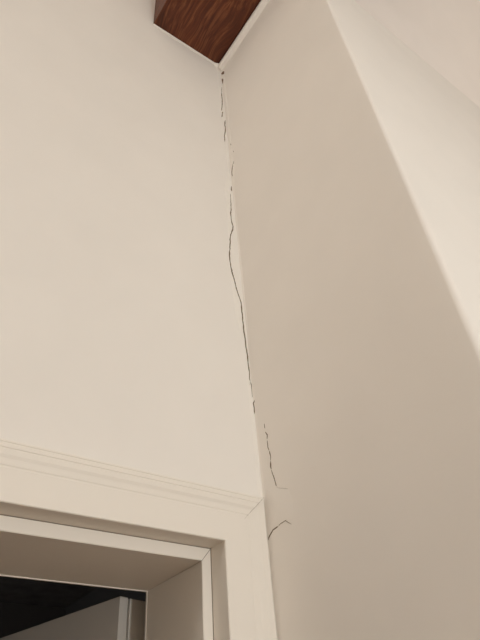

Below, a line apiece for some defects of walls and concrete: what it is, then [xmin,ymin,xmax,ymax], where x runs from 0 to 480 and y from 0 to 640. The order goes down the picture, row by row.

crack [221,88,286,489]